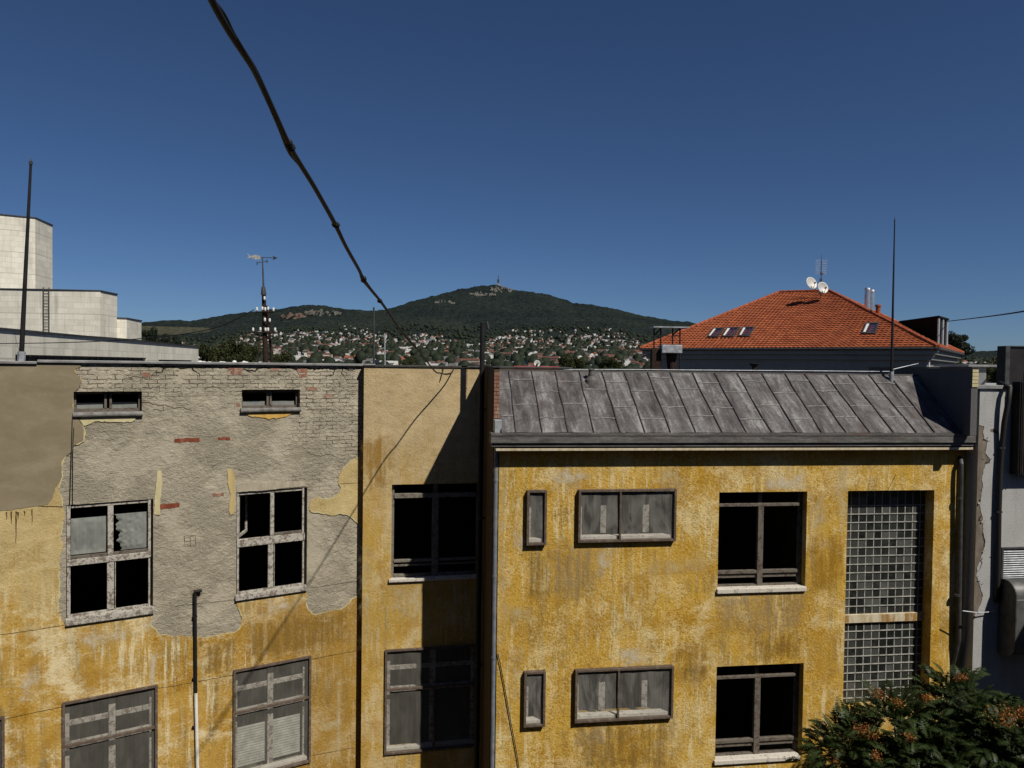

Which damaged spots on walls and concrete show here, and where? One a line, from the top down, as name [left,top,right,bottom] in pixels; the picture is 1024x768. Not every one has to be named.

flaking render [57,363,363,638]
peeling [973,425,998,618]